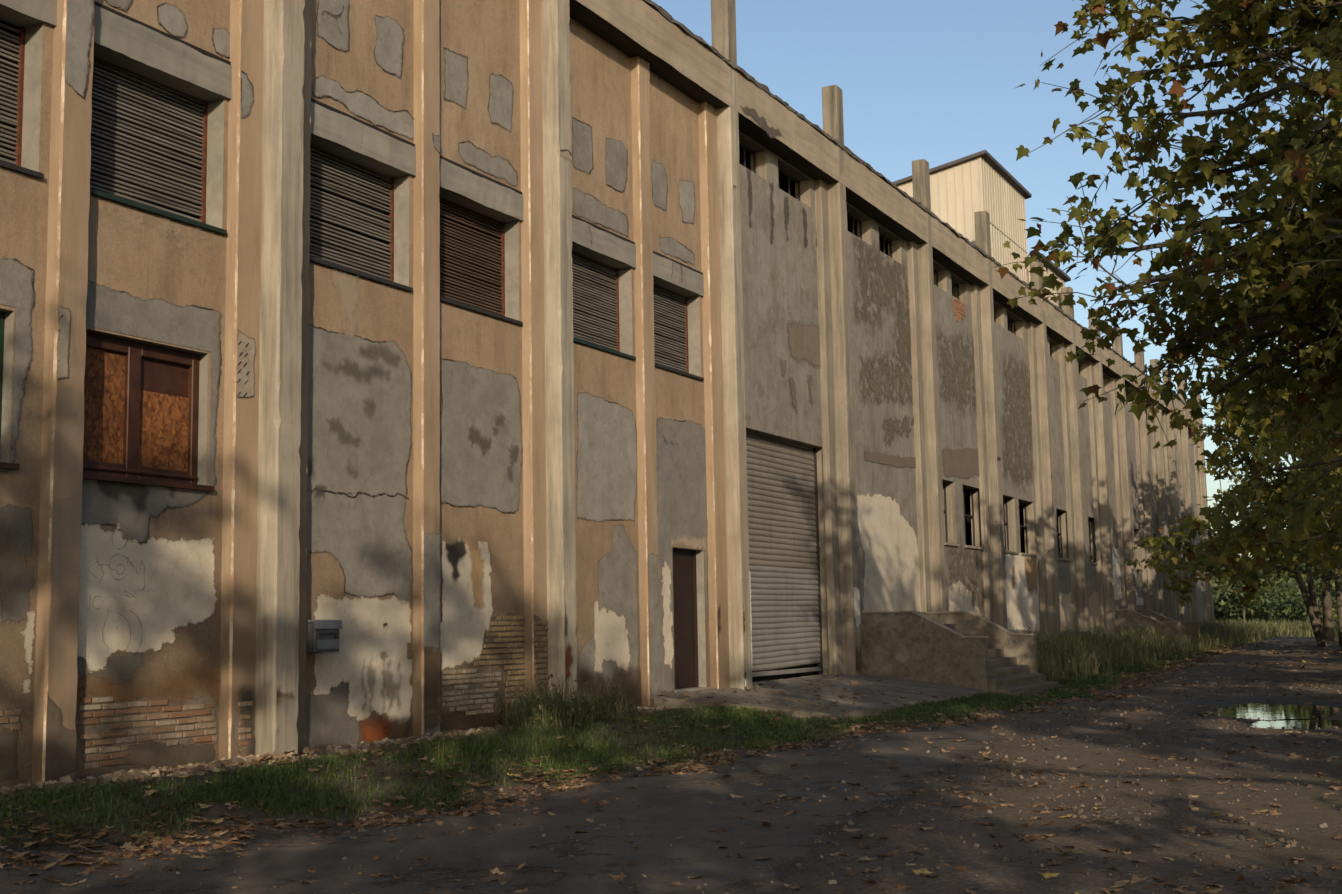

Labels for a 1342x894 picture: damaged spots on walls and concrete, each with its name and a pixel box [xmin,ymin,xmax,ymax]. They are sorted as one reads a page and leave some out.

peeling [0,609,36,731]
peeling [77,522,218,674]
flaking render [75,692,253,769]
peeling [313,593,413,723]
peeling [440,537,549,716]
peeling [594,600,630,673]
peeling [853,493,921,627]
peeling [1005,550,1040,632]